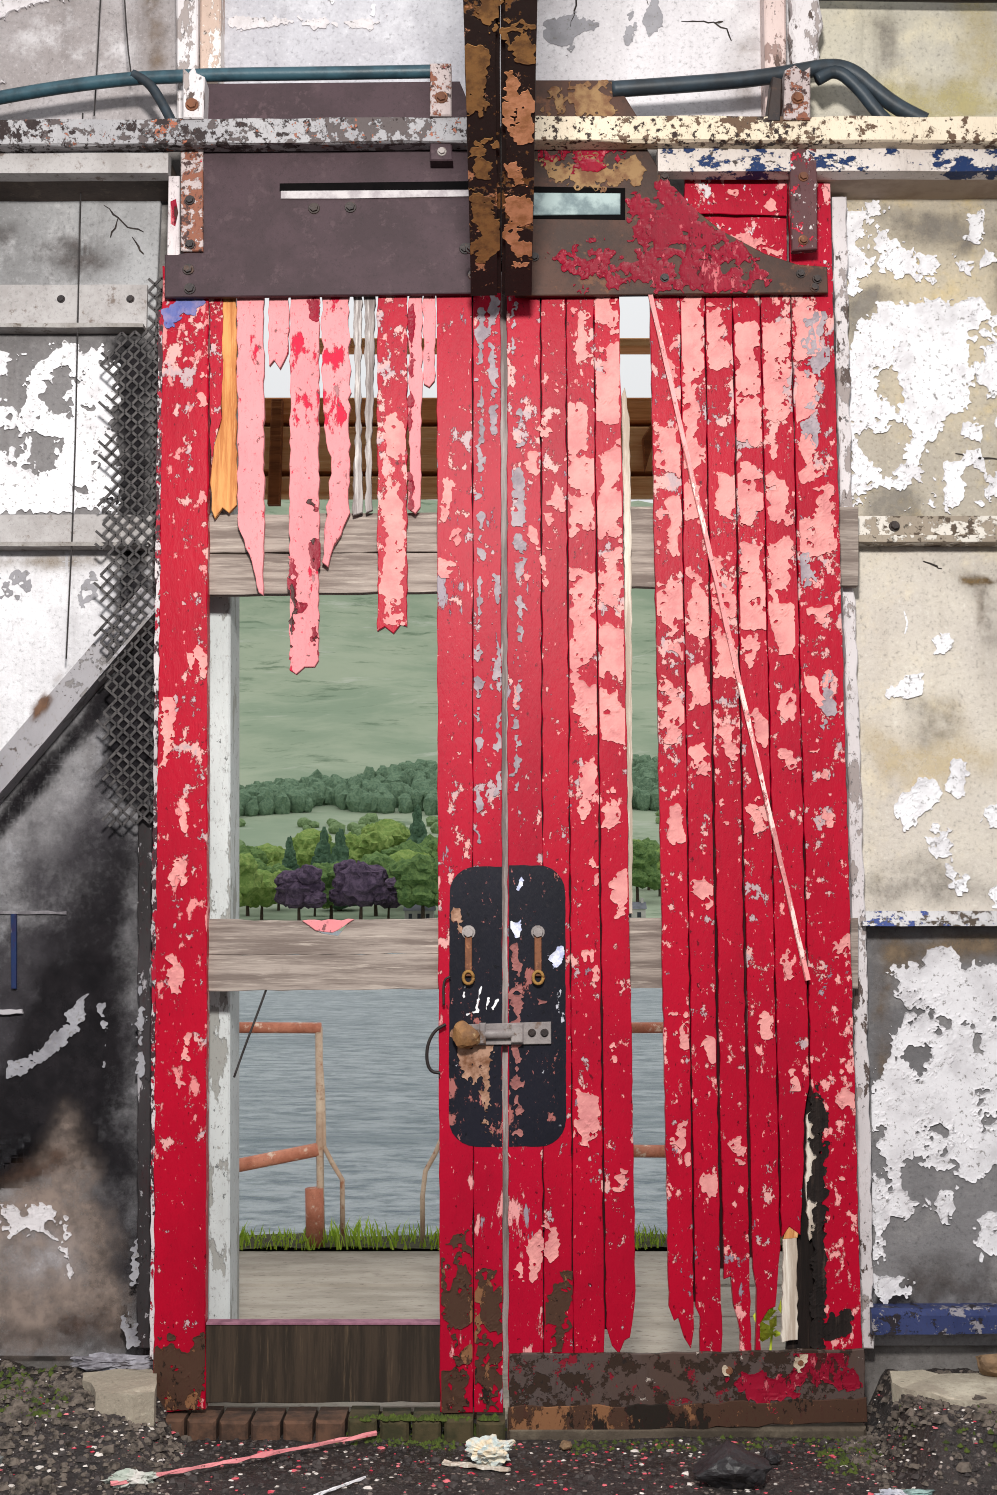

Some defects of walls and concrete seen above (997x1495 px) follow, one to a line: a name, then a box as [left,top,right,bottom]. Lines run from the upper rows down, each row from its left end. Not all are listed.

peeling [0,340,121,515]
peeling [438,295,518,752]
peeling [521,297,625,746]
peeling [653,198,997,777]
peeling [120,310,190,1360]
peeling [577,757,621,832]
peeling [0,1202,74,1279]
peeling [450,1029,525,1139]
peeling [514,1215,560,1283]
peeling [574,1088,601,1147]
peeling [670,1121,718,1198]
peeling [835,946,997,1304]